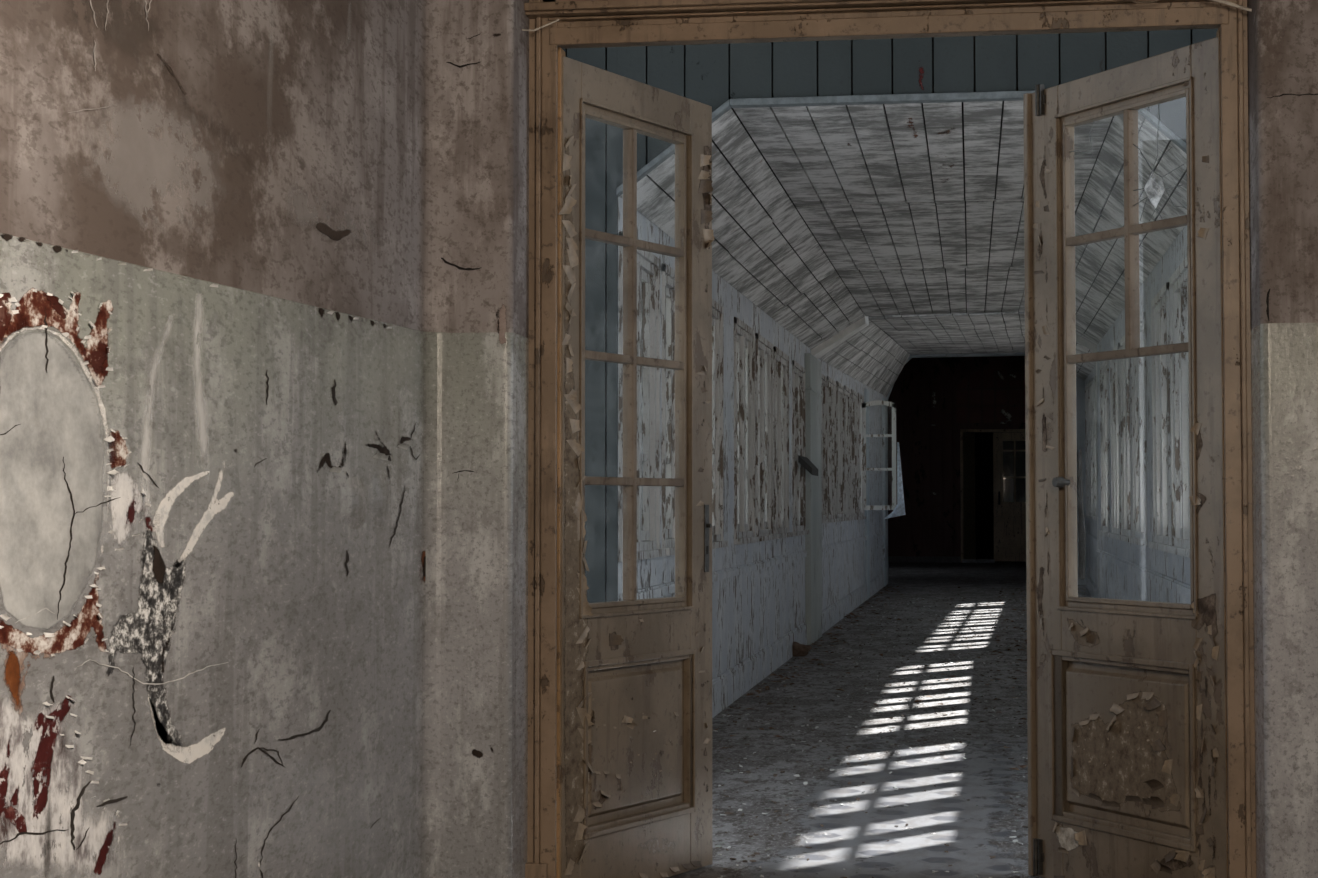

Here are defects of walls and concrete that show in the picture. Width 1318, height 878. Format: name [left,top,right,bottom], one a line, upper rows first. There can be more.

damp [85,0,152,49]
damp [98,106,213,216]
damp [292,192,366,241]
peeling [0,288,113,388]
peeling [103,429,155,551]
peeling [0,566,109,657]
peeling [0,695,127,875]